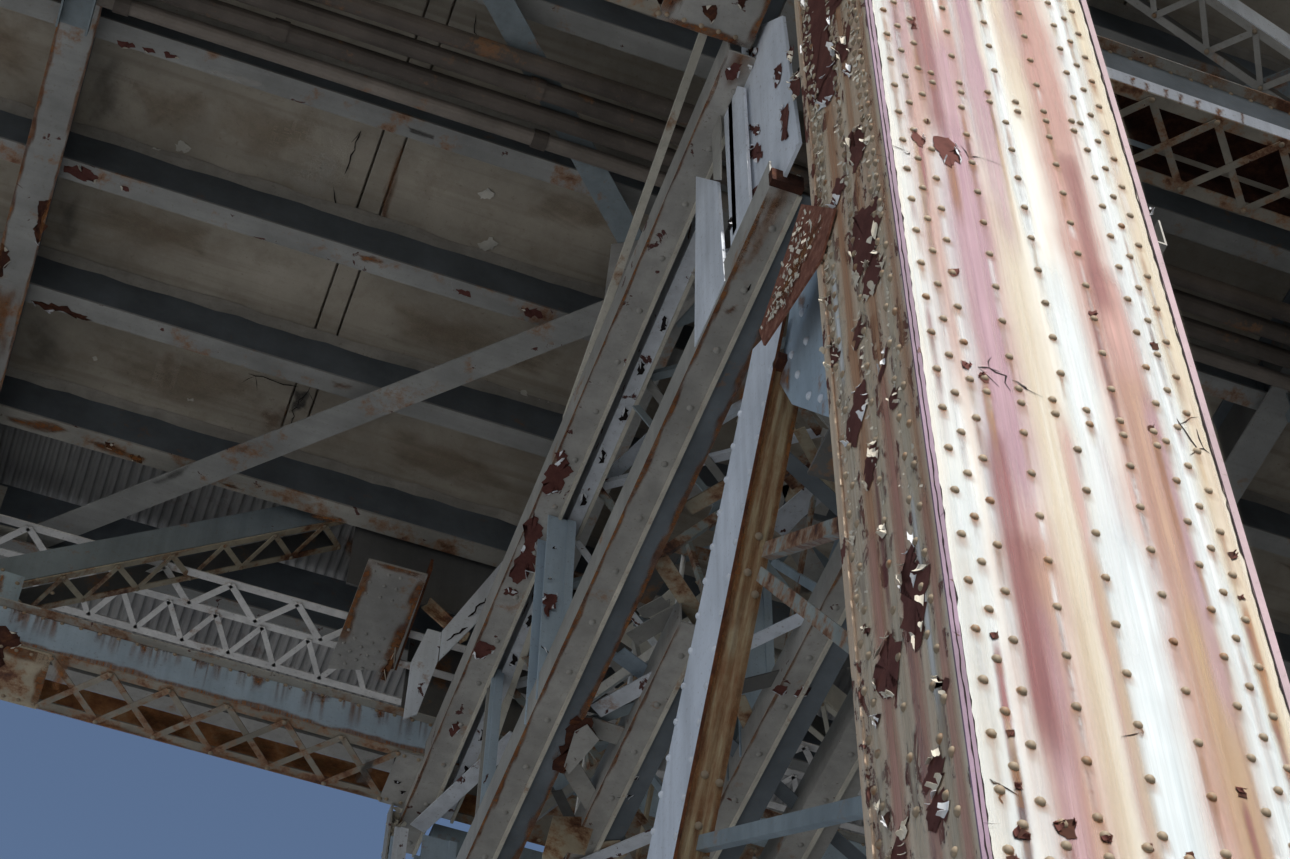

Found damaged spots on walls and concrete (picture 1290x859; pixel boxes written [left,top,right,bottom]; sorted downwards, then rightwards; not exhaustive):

crack [333,131,361,203]
peeling [911,119,962,168]
peeling [760,0,931,728]
rust [0,0,785,859]
peeling [541,450,574,496]
rust [895,0,1109,859]
rust [1011,0,1260,859]
peeling [503,514,558,628]
rust [1245,613,1278,723]
rust [711,625,813,832]
peeling [873,799,909,859]
peeling [922,747,950,833]